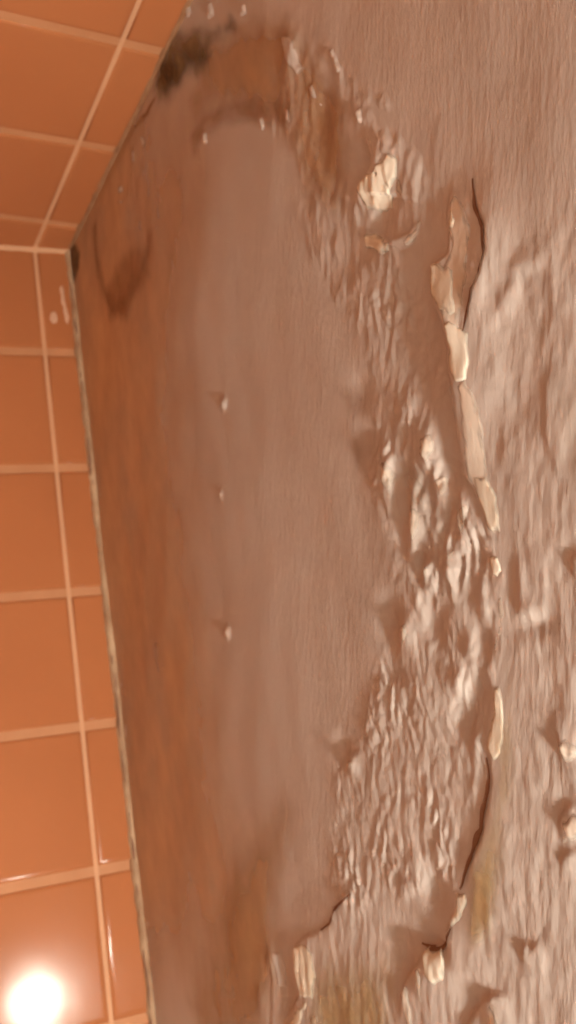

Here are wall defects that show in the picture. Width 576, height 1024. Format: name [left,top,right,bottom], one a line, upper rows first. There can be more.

water stain [157,32,280,100]
crack [462,178,484,331]
peeling [179,0,576,1024]